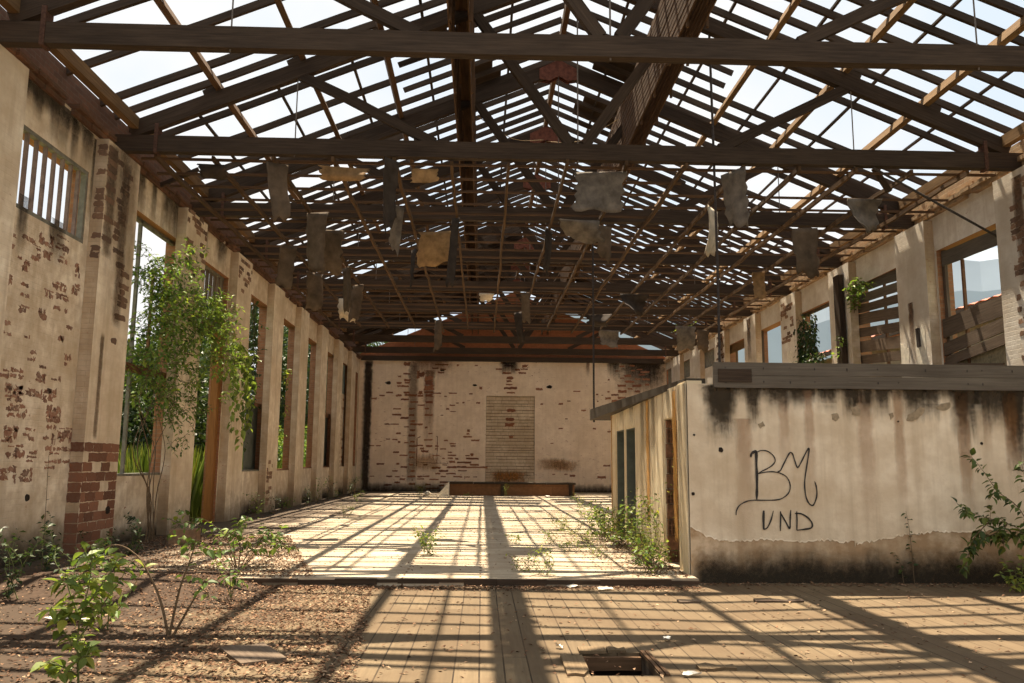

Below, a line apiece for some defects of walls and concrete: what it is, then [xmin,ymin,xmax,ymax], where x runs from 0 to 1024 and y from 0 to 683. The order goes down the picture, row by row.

flaking render [89,144,133,322]
peeling [0,231,119,554]
damp [705,385,1024,442]
damp [699,558,1024,584]